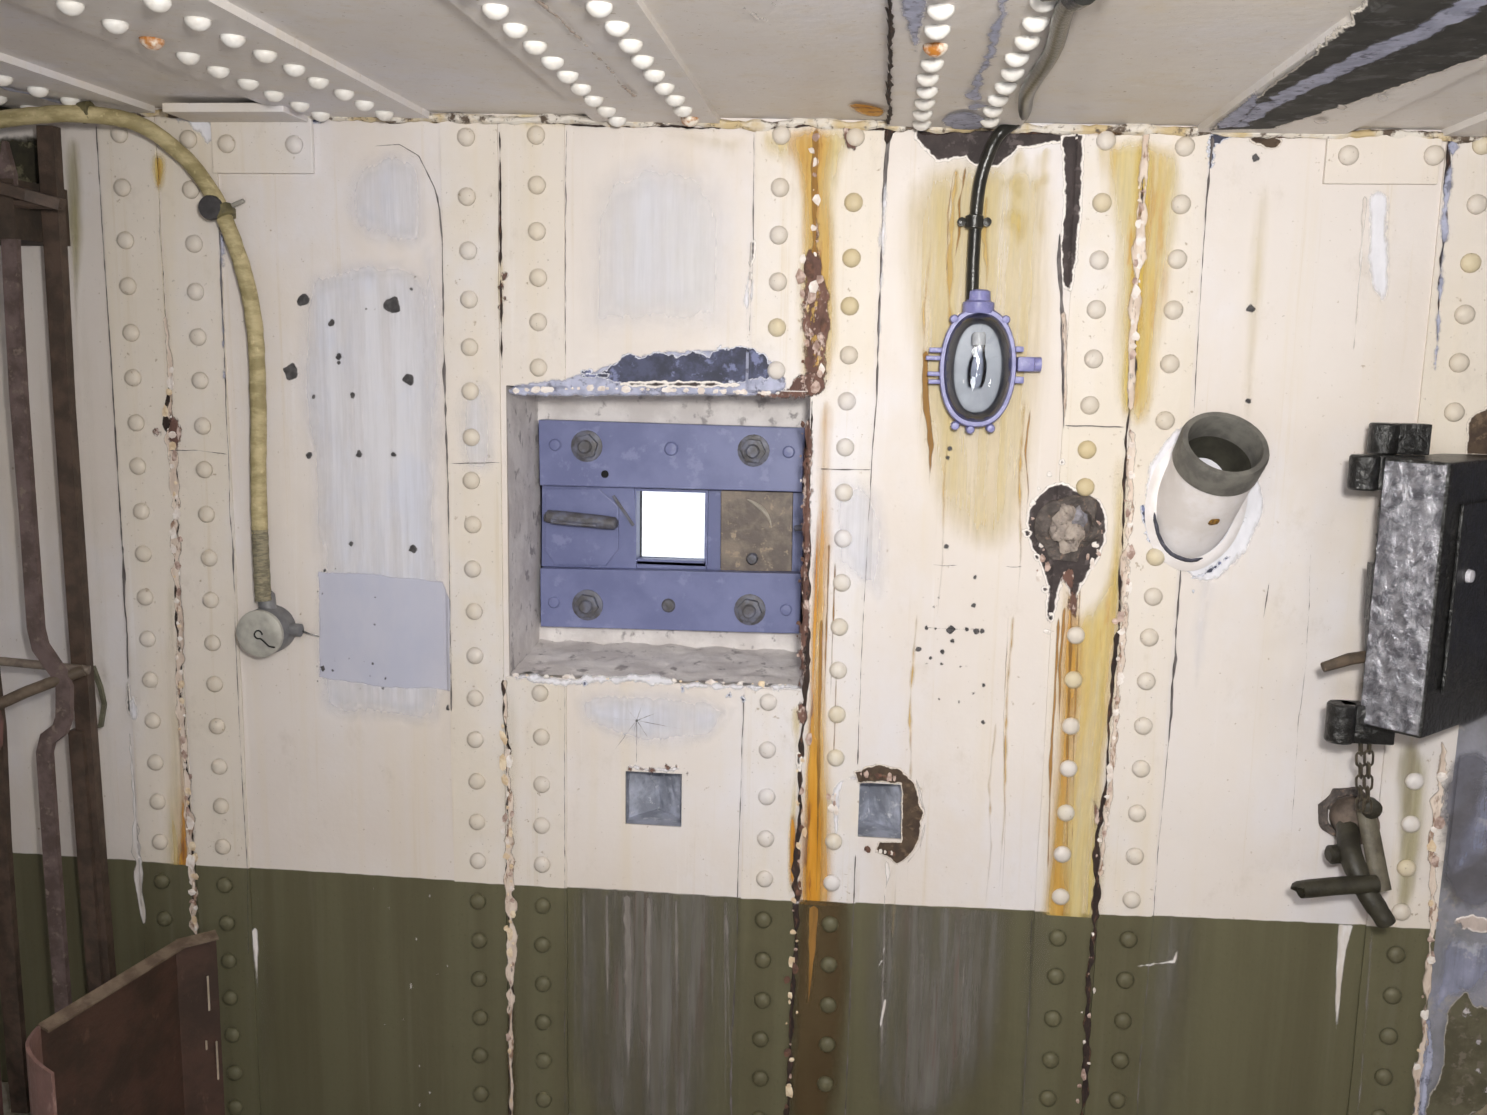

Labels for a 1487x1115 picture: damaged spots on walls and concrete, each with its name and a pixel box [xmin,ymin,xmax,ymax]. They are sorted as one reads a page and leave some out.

crack [153,228,235,935]
crack [499,680,518,1115]
peeling [509,345,786,396]
corrosion [756,133,840,399]
corrosion [790,420,845,1115]
crack [771,0,926,1115]
spalling [916,625,984,667]
corrosion [922,169,1032,511]
peeling [1020,459,1107,634]
corrosion [1048,587,1116,917]
crack [1065,132,1157,1115]
peeling [1465,407,1487,455]